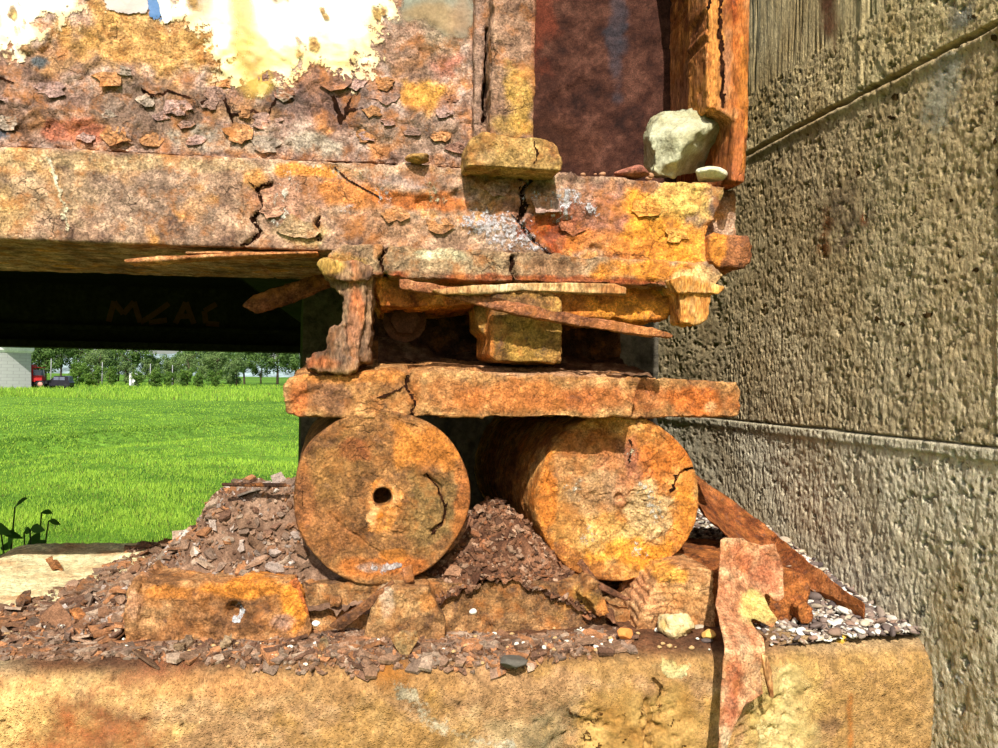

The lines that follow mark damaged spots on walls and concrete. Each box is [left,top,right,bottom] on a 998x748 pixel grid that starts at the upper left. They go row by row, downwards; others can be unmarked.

rust [7,2,25,27]
peeling [0,0,473,154]
rust [233,0,268,91]
rust [296,36,320,57]
crack [240,181,272,246]
crack [511,141,552,255]
crack [508,254,516,279]
rust [46,711,138,748]